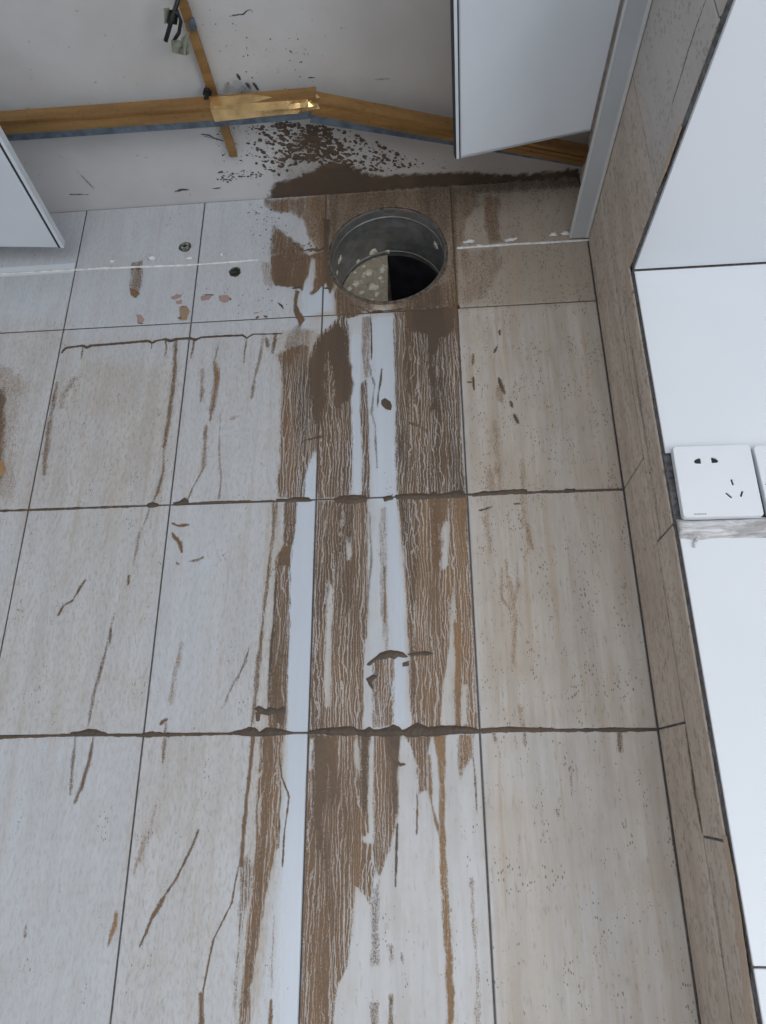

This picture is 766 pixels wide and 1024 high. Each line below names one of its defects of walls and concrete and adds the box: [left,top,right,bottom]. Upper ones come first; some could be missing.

damp [0,364,31,500]
damp [152,340,178,501]
damp [243,169,580,887]
damp [232,502,297,1011]
damp [415,621,478,1024]
damp [305,888,332,1024]
damp [370,994,394,1024]
damp [369,881,404,966]
damp [469,879,481,1024]